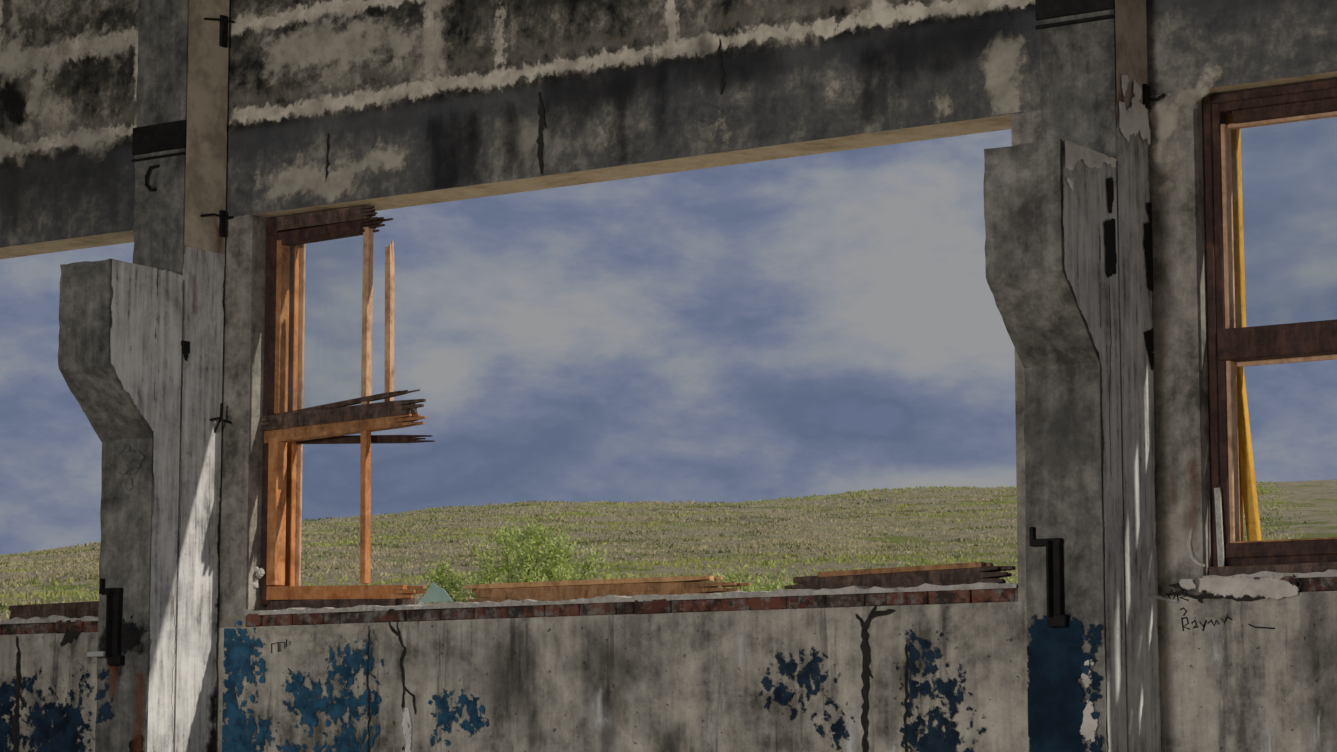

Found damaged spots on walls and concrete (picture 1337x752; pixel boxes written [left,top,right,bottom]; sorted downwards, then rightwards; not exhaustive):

damp [982,36,1026,114]
spalling [1119,74,1151,144]
spalling [1065,141,1117,278]
spalling [1144,202,1153,291]
spalling [1179,528,1298,599]
peeling [0,663,115,752]
peeling [222,620,401,752]
peeling [428,689,489,746]
peeling [755,646,855,752]
crack [855,605,909,752]
peeling [891,624,986,752]
peeling [1027,613,1104,752]